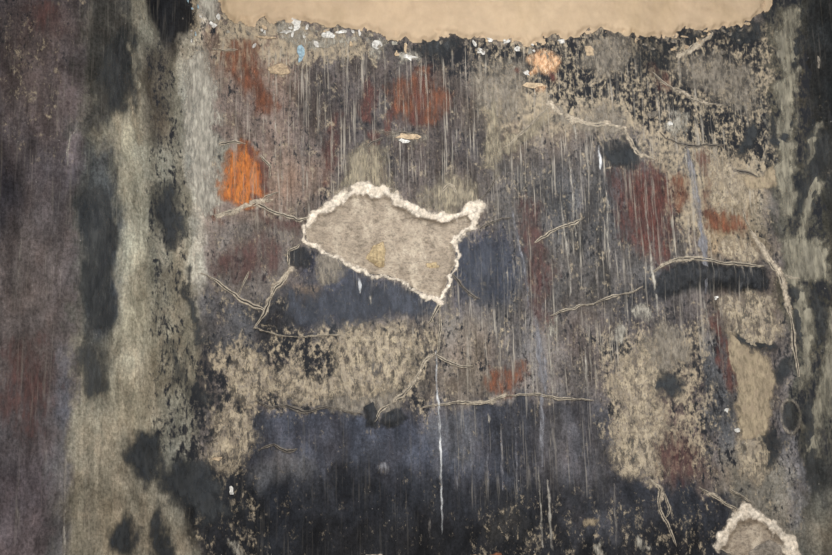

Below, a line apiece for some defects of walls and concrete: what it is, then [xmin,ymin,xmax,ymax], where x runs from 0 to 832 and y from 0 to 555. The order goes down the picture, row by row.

rust [217,139,269,208]
spalling [302,144,486,305]
spalling [713,502,800,555]